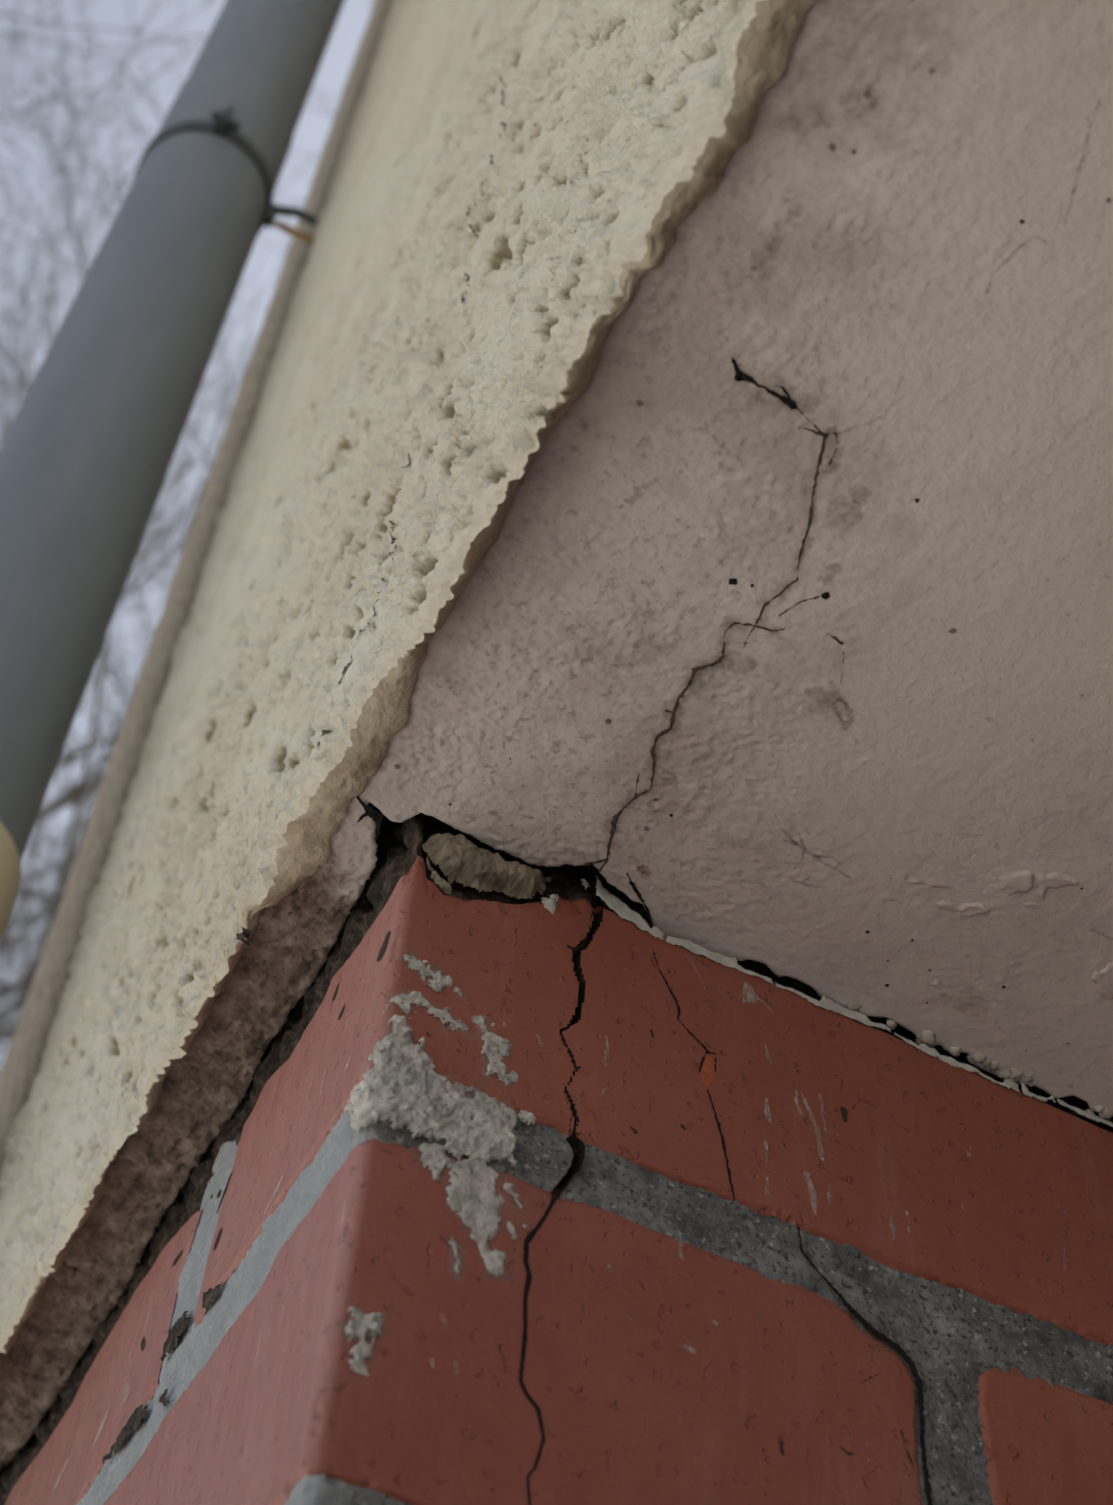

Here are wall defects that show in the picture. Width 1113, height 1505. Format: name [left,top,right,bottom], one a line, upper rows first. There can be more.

crack [356,796,383,839]
spalling [421,833,559,914]
flaking render [236,927,252,946]
spalling [376,931,390,961]
crack [519,358,844,1505]
spalling [213,1172,232,1251]
peeling [445,1156,527,1278]